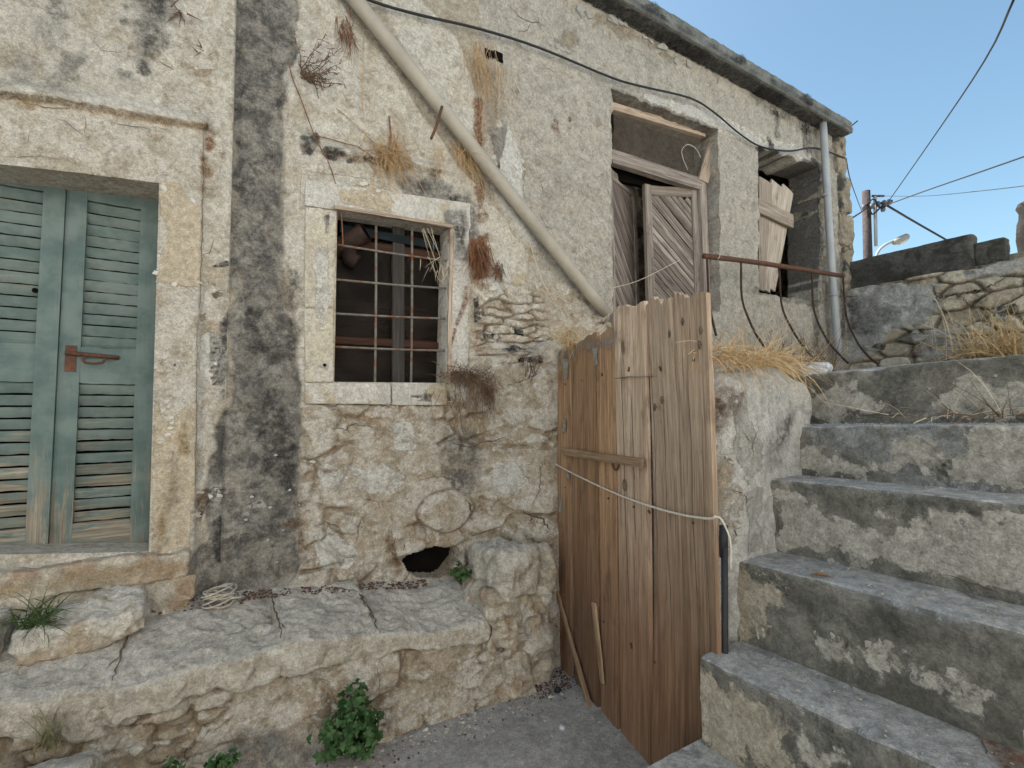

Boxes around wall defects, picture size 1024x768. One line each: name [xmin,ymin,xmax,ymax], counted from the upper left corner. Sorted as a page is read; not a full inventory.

spalling [473,297,543,366]
leakage [214,515,222,561]